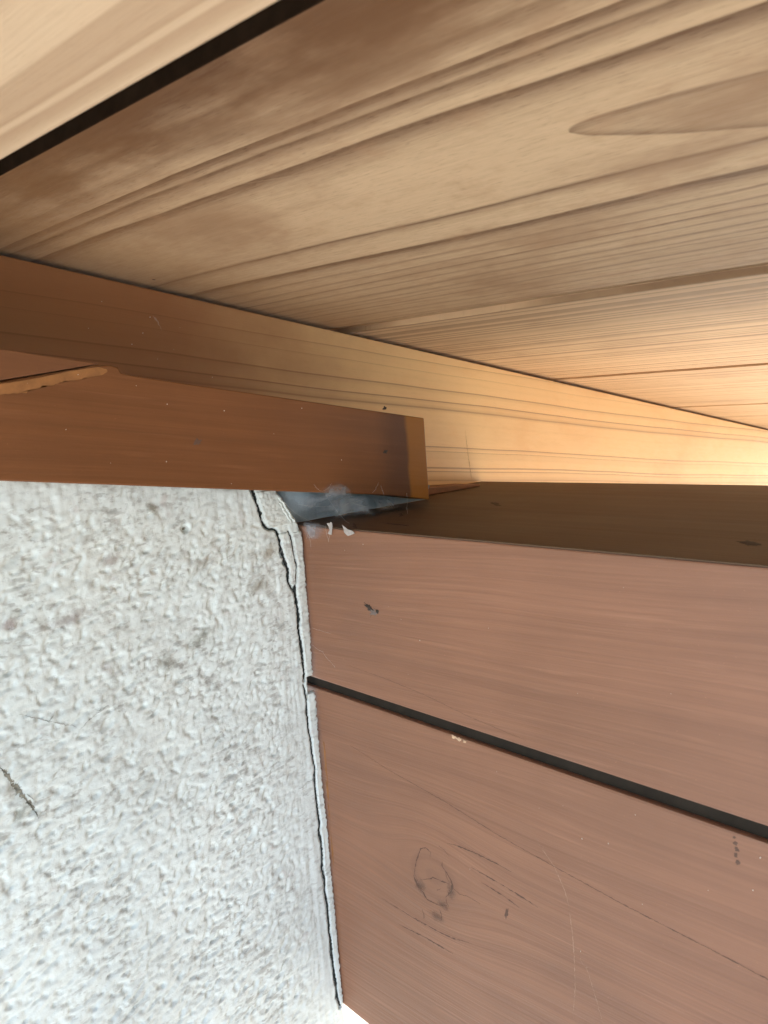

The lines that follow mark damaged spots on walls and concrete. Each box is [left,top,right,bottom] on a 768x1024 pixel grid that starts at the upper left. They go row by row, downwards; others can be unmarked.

crack [0,768,38,817]
crack [251,490,341,1006]